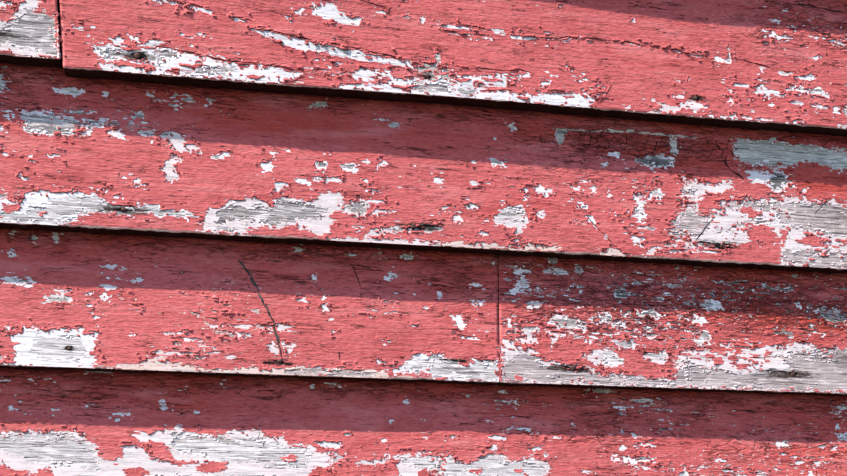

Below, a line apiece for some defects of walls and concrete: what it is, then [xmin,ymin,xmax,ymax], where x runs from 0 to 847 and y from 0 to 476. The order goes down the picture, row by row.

peeling [618,0,847,129]
crack [237,259,286,362]
peeling [0,122,847,476]